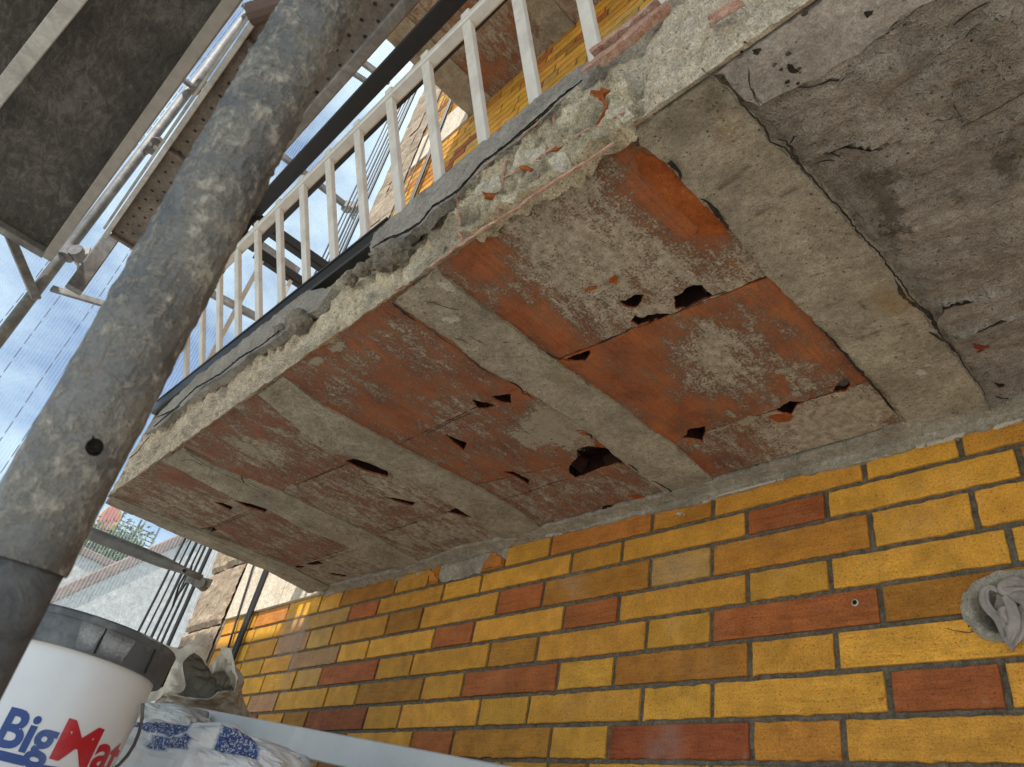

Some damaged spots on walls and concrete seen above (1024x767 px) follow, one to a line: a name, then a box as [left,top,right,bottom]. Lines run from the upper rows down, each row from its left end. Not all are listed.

spalling [430,75,727,267]
crack [667,161,682,179]
crack [926,93,1024,128]
crack [701,68,1008,419]
crack [129,329,281,459]
peeling [577,430,621,467]